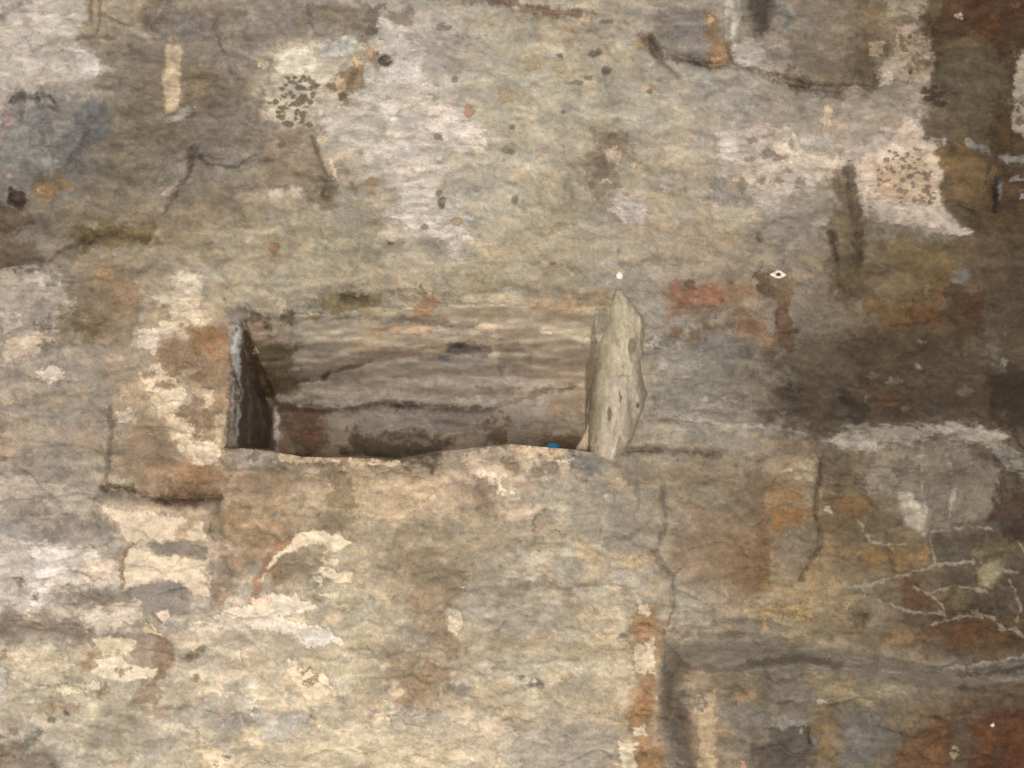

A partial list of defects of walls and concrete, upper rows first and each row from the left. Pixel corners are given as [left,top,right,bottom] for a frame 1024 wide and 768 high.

rust [665,270,798,352]
peeling [0,529,354,752]
crack [635,481,694,644]
crack [800,455,825,580]
crack [845,520,1024,638]